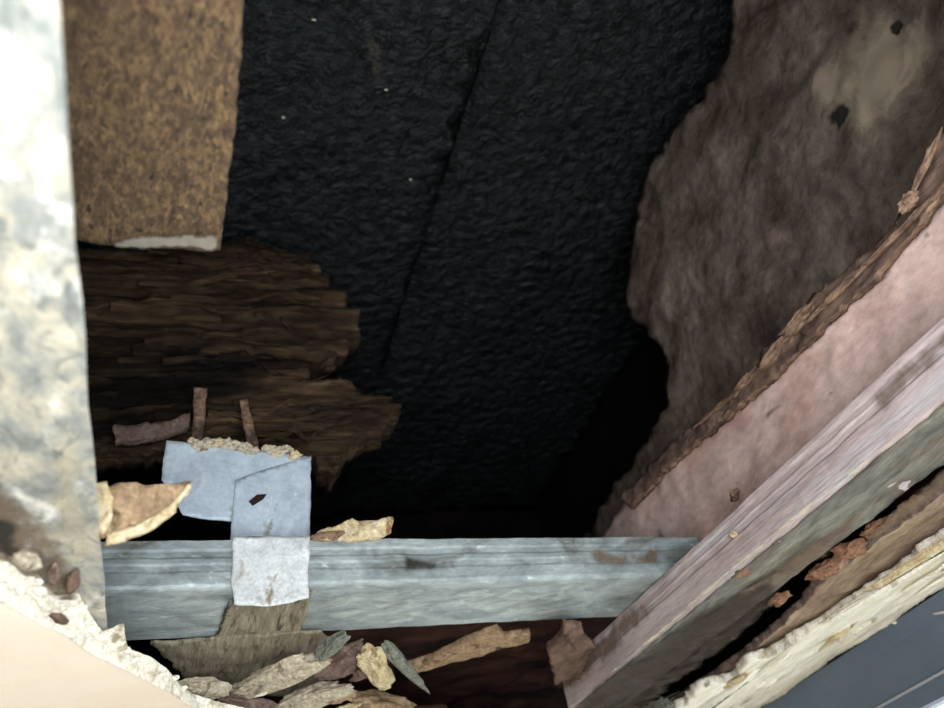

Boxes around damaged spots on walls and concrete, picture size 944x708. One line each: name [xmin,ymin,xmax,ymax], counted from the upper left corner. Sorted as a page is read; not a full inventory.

leakage [0,495,74,600]
spalling [104,483,191,546]
spalling [0,552,243,708]